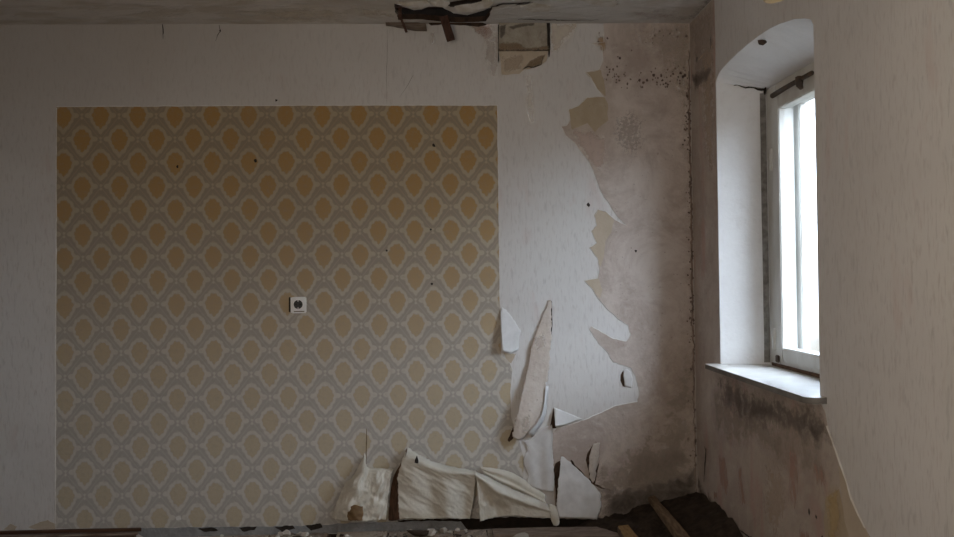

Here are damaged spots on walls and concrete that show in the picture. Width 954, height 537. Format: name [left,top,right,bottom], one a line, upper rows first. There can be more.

peeling [137,0,870,537]
leakage [599,163,711,518]
leakage [606,46,713,160]
leakage [715,380,826,468]